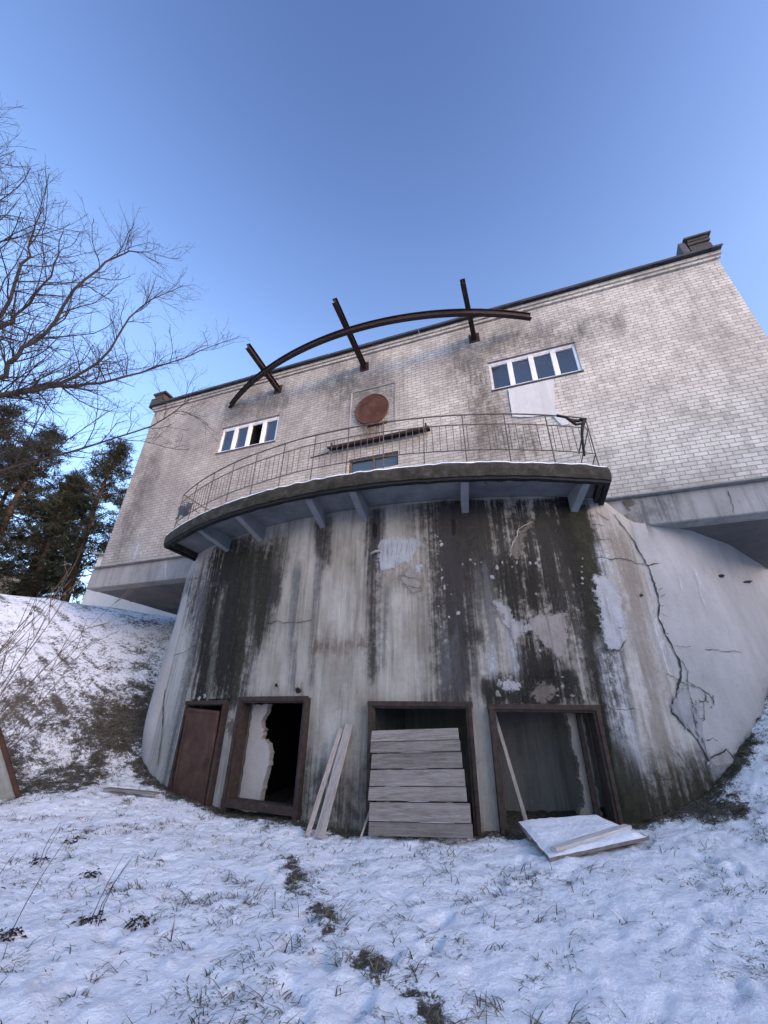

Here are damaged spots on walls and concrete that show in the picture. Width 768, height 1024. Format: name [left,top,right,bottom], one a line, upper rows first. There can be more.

damp [165,536,301,779]
damp [312,523,332,637]
damp [364,509,386,681]
peeling [372,522,426,597]
damp [408,498,572,702]
spalling [481,599,588,712]
peeling [580,557,628,652]
crack [580,508,742,769]